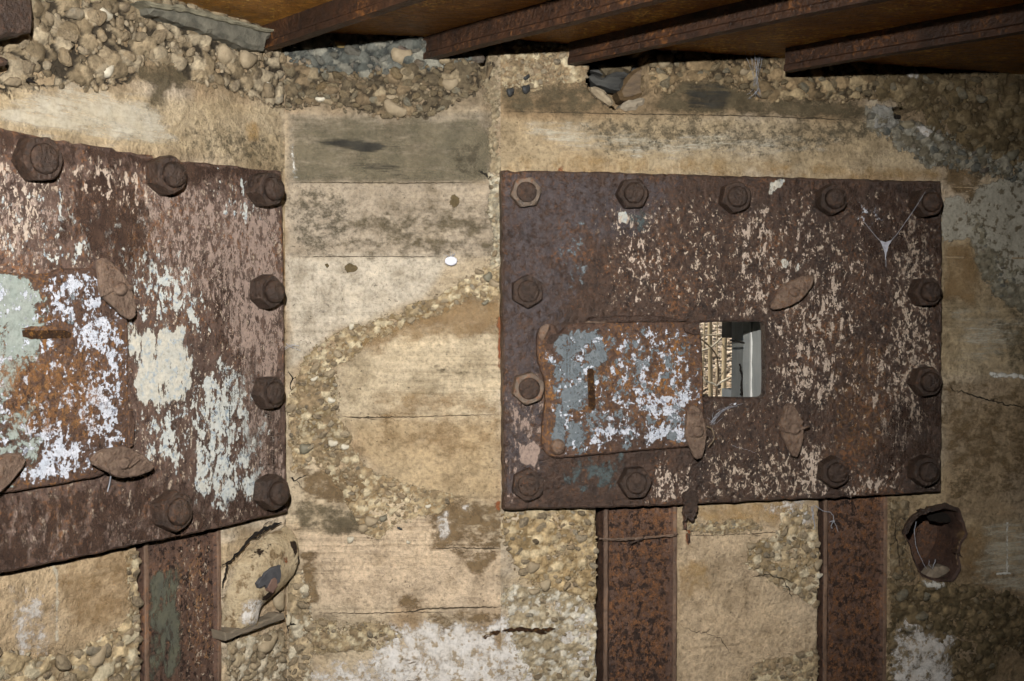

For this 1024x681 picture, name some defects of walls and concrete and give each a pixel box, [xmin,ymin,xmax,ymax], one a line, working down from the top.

corrosion [56,142,159,273]
corrosion [184,163,266,192]
spalling [0,0,1024,539]
corrosion [0,354,109,440]
crack [951,388,1021,407]
corrosion [0,473,286,681]
spalling [0,494,403,681]
water stain [311,610,532,681]
water stain [557,607,596,672]
corrosion [609,506,670,681]
corrosion [821,495,880,681]
corrosion [906,512,937,564]